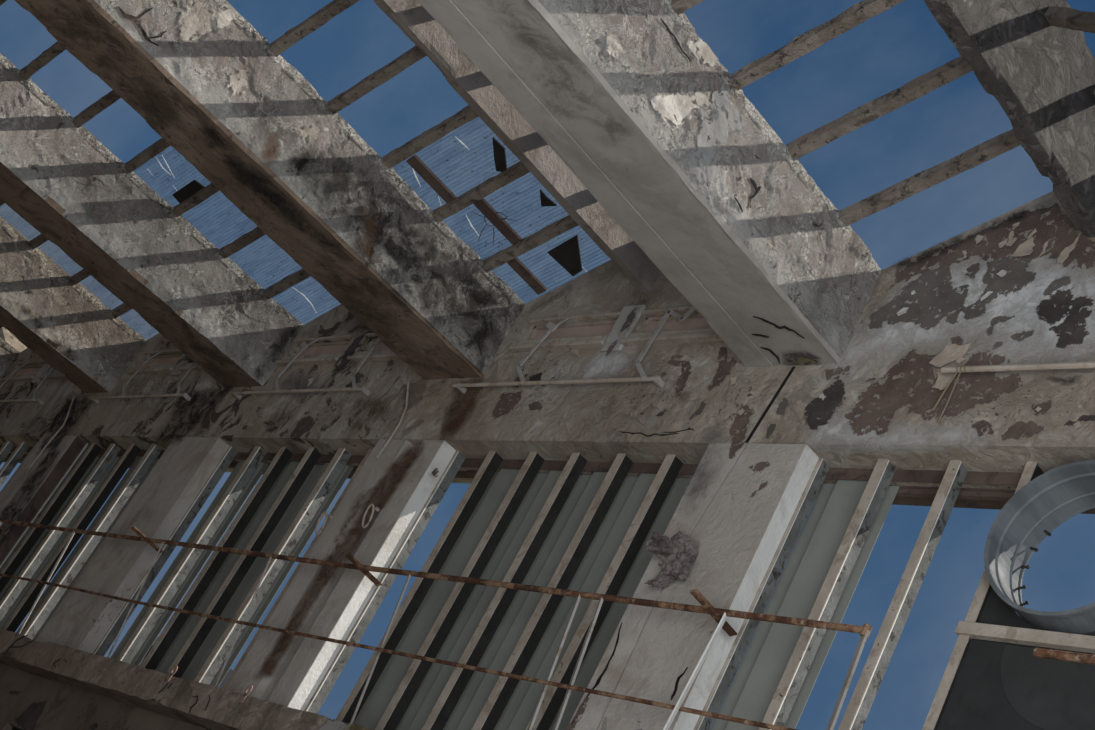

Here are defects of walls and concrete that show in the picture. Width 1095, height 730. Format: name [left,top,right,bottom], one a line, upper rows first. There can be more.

crack [752,316,804,364]
peeling [785,203,1095,440]
peeling [491,351,557,419]
peeling [689,347,761,459]
peeling [766,398,788,438]
crack [565,623,622,730]
crack [671,667,688,700]